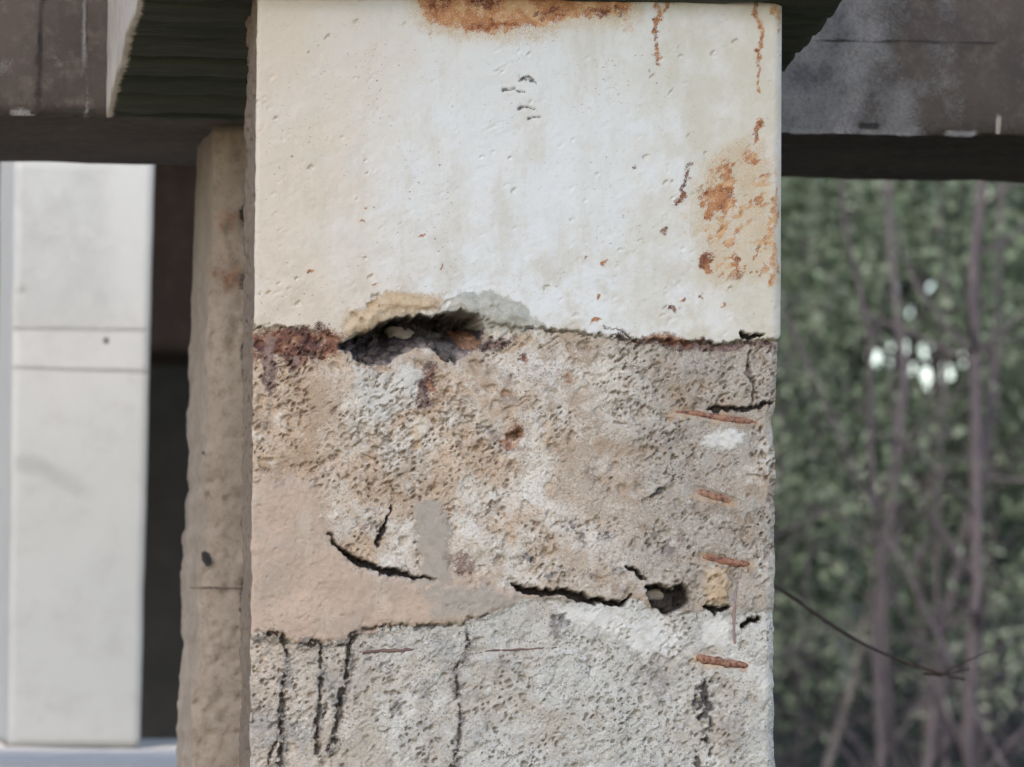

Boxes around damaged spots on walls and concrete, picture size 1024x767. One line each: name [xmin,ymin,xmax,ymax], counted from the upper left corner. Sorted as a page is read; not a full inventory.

corrosion [399,0,670,67]
corrosion [751,2,781,94]
crack [502,76,540,120]
corrosion [660,115,780,312]
corrosion [252,321,351,394]
crack [520,324,634,342]
crack [706,331,774,414]
crack [327,505,432,580]
spalling [249,311,778,767]
crack [511,565,647,607]
crack [253,615,485,767]